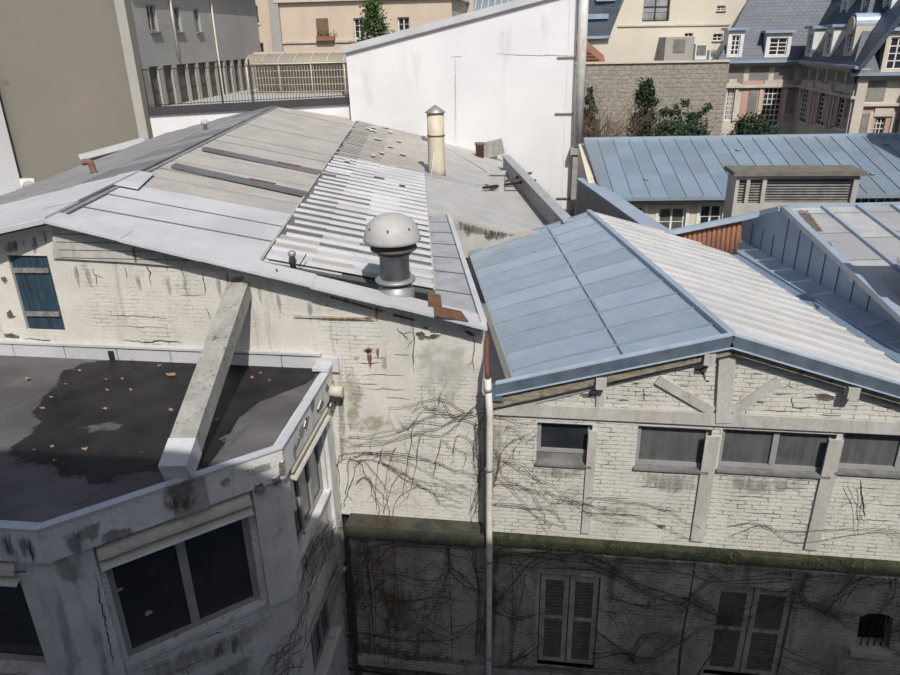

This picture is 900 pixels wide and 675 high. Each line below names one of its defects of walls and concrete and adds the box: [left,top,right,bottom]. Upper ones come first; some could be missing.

corrosion [322,295,383,320]
flaking render [416,325,441,340]
peeling [254,460,285,495]
crack [852,485,899,521]
crack [95,575,116,670]